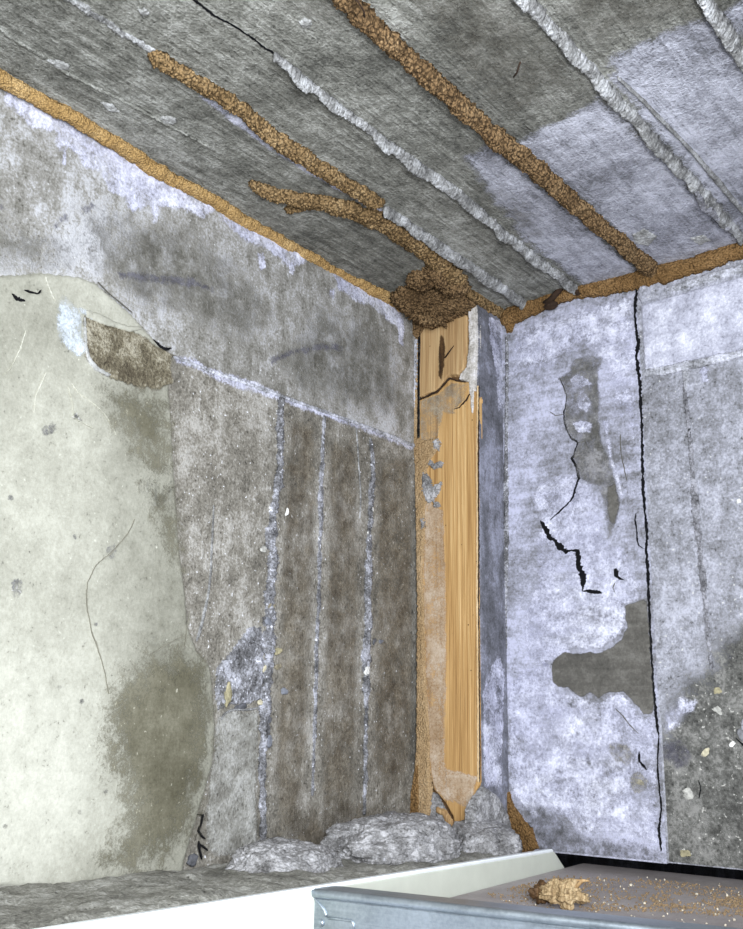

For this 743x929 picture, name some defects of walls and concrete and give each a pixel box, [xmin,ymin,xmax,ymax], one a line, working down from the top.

crack [193,0,274,54]
water stain [466,146,634,285]
water stain [519,0,743,265]
spalling [83,310,173,390]
crack [540,377,616,594]
crack [615,289,662,851]
water stain [100,644,219,874]